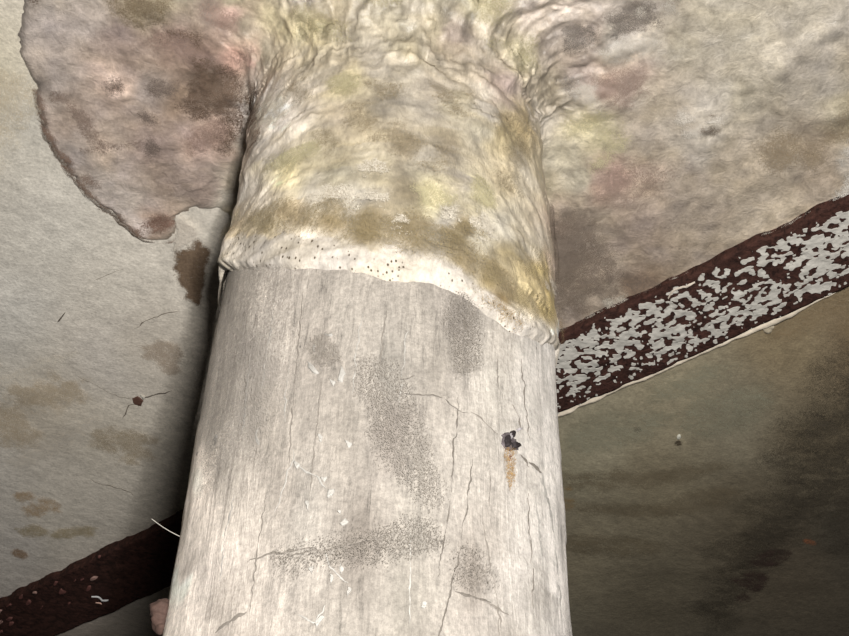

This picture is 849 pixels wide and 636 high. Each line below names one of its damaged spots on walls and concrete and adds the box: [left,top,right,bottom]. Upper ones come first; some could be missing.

damp [102,0,295,159]
damp [296,182,389,210]
peeling [217,211,849,417]
crack [402,375,492,636]
rust [501,445,517,490]